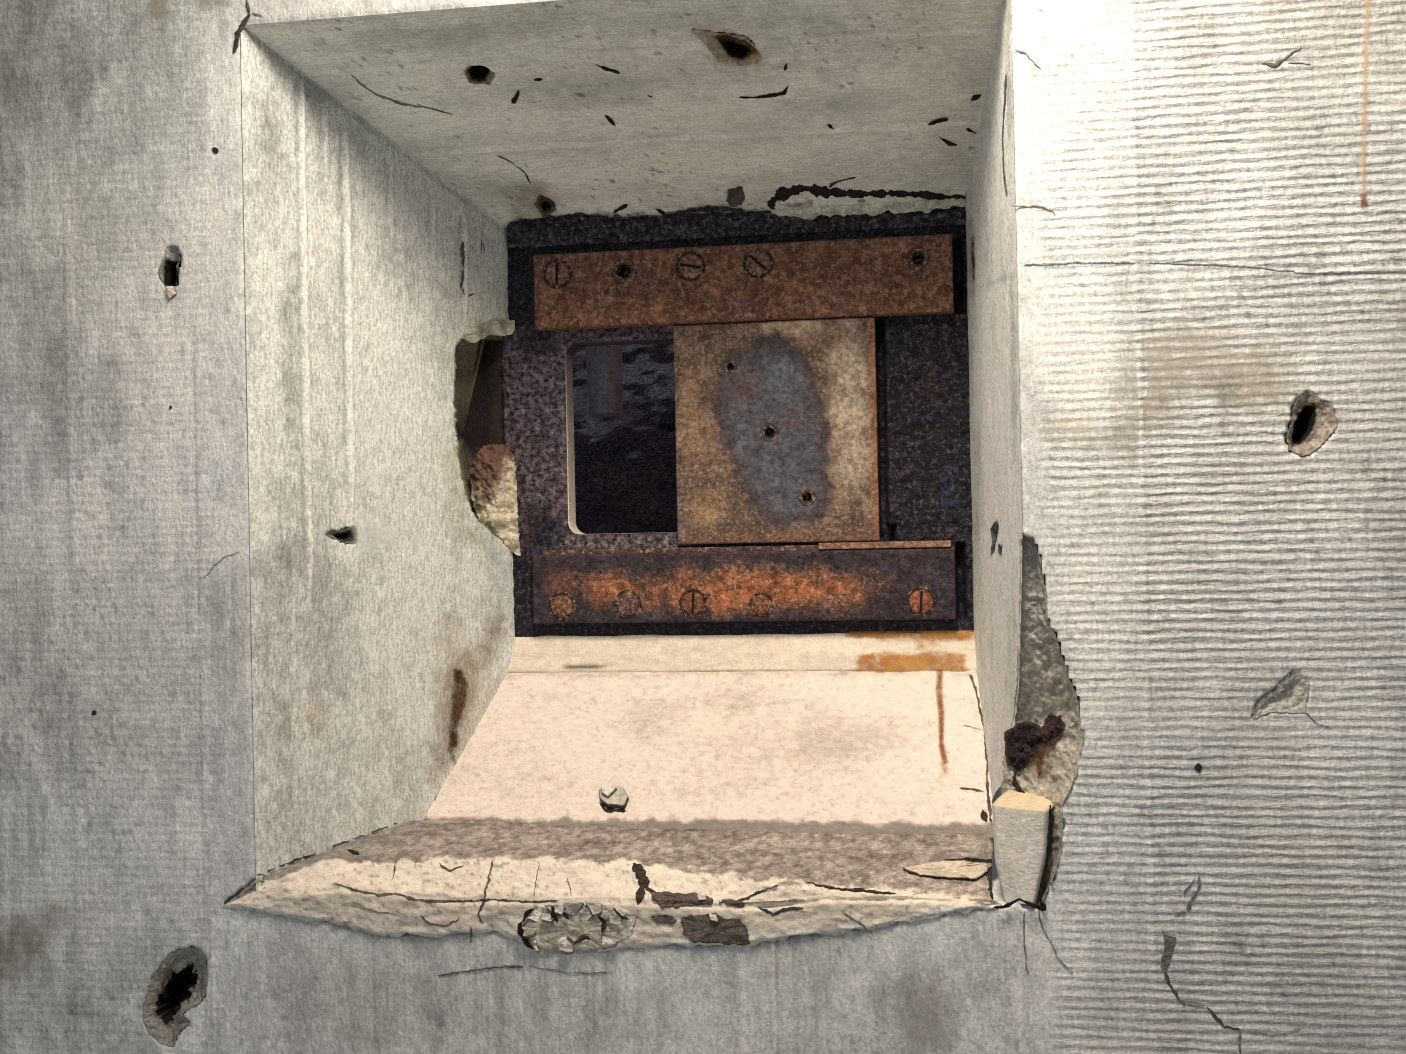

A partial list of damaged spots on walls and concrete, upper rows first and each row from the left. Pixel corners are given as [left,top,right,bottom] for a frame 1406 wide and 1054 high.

crack [233,0,262,54]
spalling [453,318,521,556]
rust [847,630,974,773]
spalling [903,532,1084,911]
spalling [143,948,207,1046]
spalling [517,891,750,955]
crack [1161,871,1300,1054]